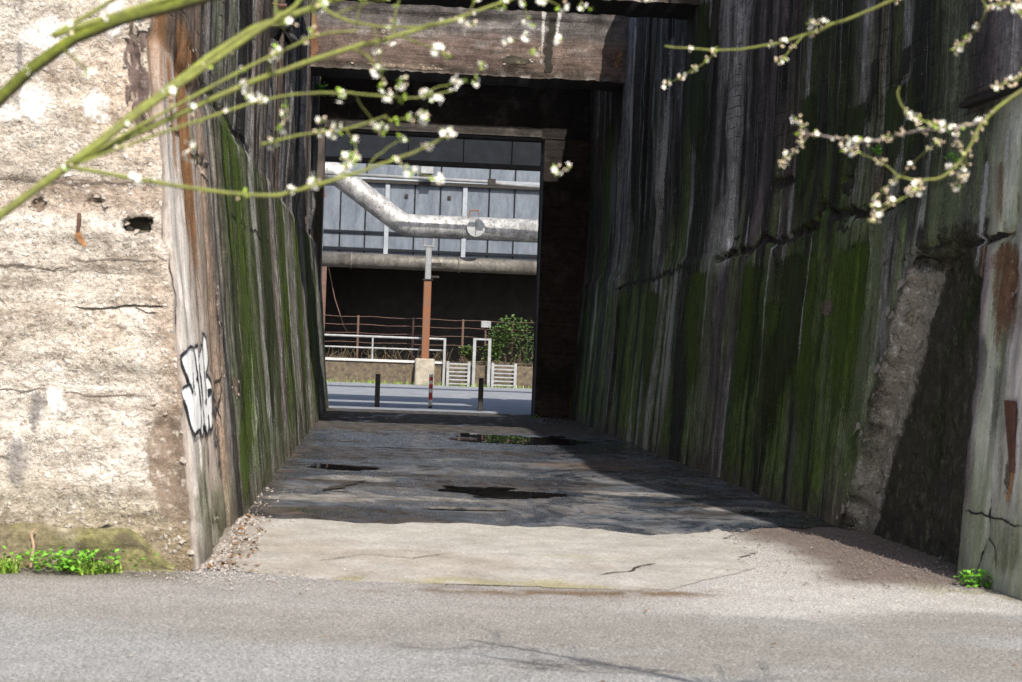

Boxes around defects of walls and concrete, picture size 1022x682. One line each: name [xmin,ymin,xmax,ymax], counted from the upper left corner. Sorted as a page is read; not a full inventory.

crack [0,258,177,330]
spalling [123,216,154,234]
corrosion [147,16,199,300]
water stain [215,108,320,466]
water stain [597,18,674,302]
water stain [641,265,728,422]
water stain [688,0,732,171]
water stain [734,216,883,470]
corrosion [981,235,1019,351]
corrosion [1004,400,1016,507]
crack [965,499,1020,574]